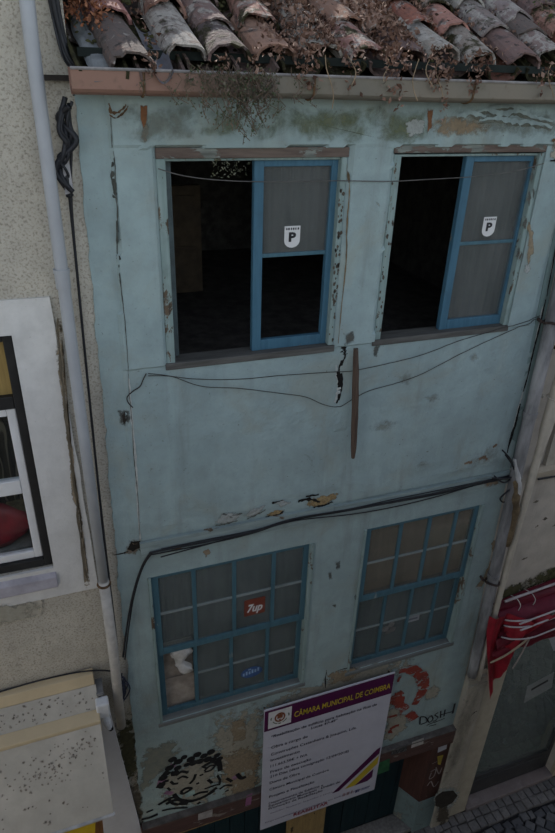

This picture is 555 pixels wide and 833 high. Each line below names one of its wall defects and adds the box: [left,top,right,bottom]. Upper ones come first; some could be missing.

peeling [329,172,350,343]
crack [334,347,348,403]
crack [507,251,555,453]
flaking render [216,493,339,526]
peeling [140,703,263,807]